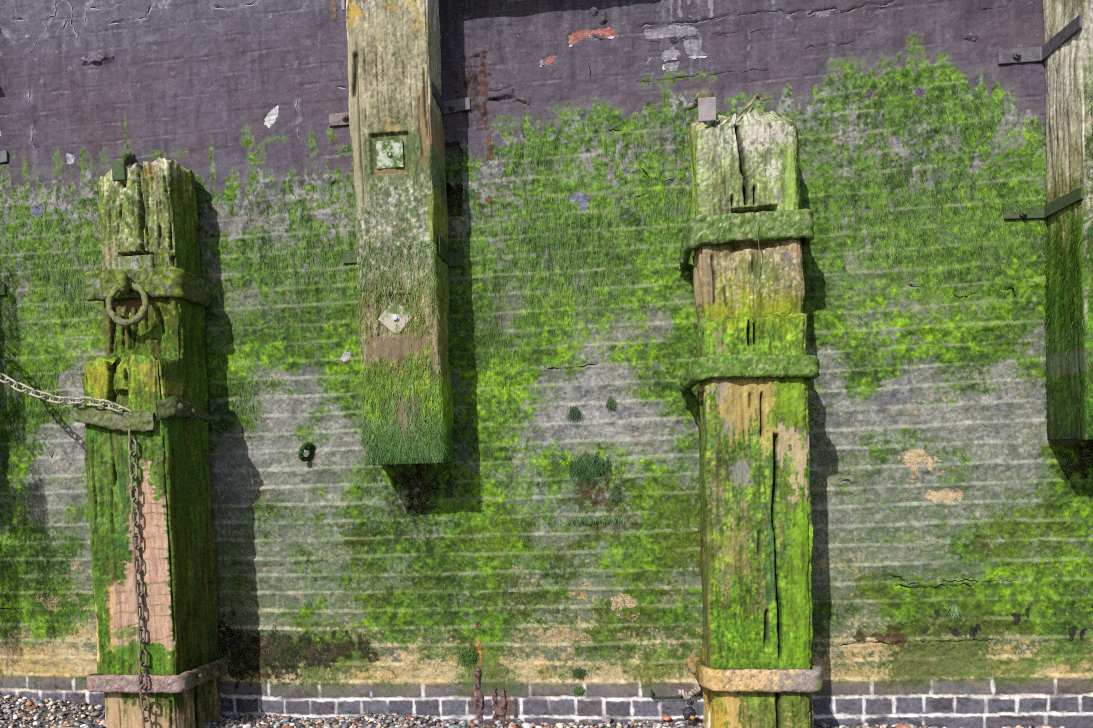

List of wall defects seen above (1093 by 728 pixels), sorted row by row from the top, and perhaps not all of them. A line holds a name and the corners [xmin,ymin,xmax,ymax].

crack [0,0,152,56]
spalling [568,27,616,47]
spalling [644,25,706,72]
rust [452,55,494,160]
crack [890,575,1012,588]